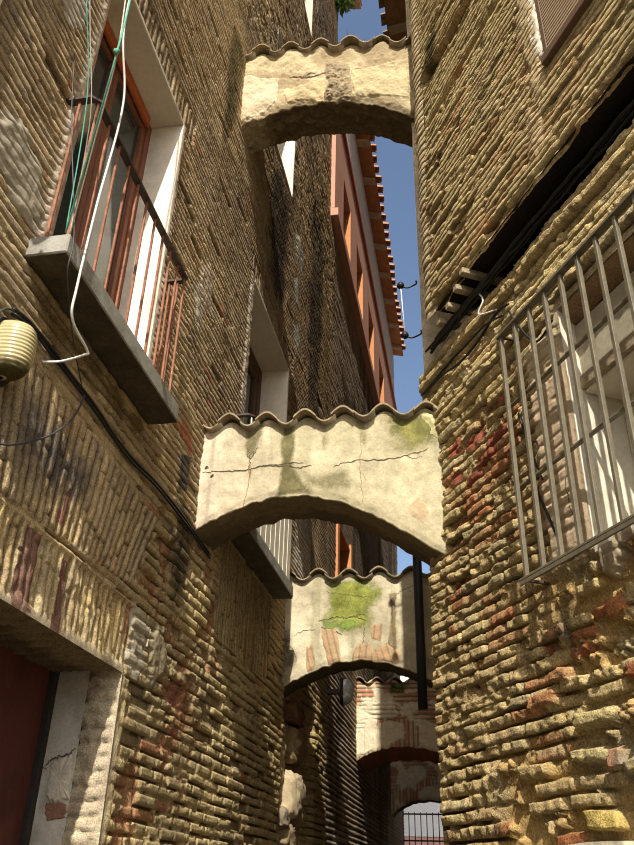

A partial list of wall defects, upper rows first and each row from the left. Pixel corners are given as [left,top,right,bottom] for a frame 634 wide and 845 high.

crack [203,446,312,507]
crack [335,433,427,502]
flaking render [306,628,341,672]
damp [323,619,355,629]
flaking render [352,624,402,664]
crack [45,748,76,766]
peeling [42,754,73,821]